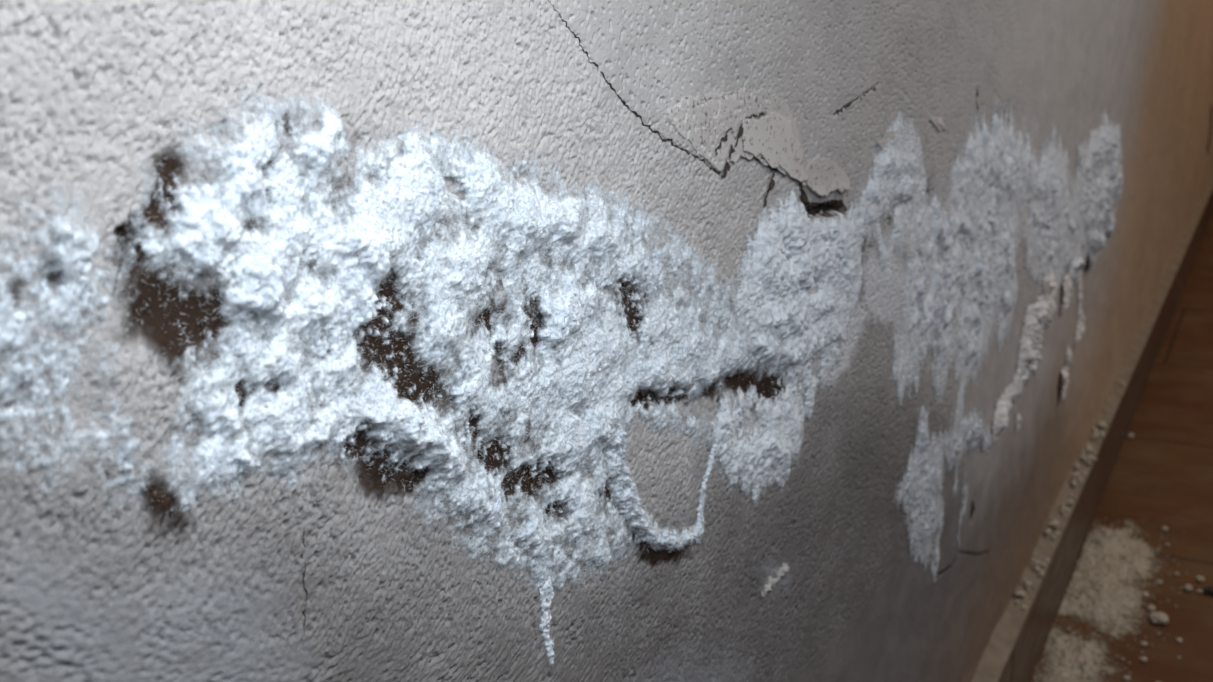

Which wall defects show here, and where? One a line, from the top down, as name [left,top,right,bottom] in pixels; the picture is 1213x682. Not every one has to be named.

crack [548,0,787,209]
peeling [667,88,851,222]
damp [0,81,1125,667]